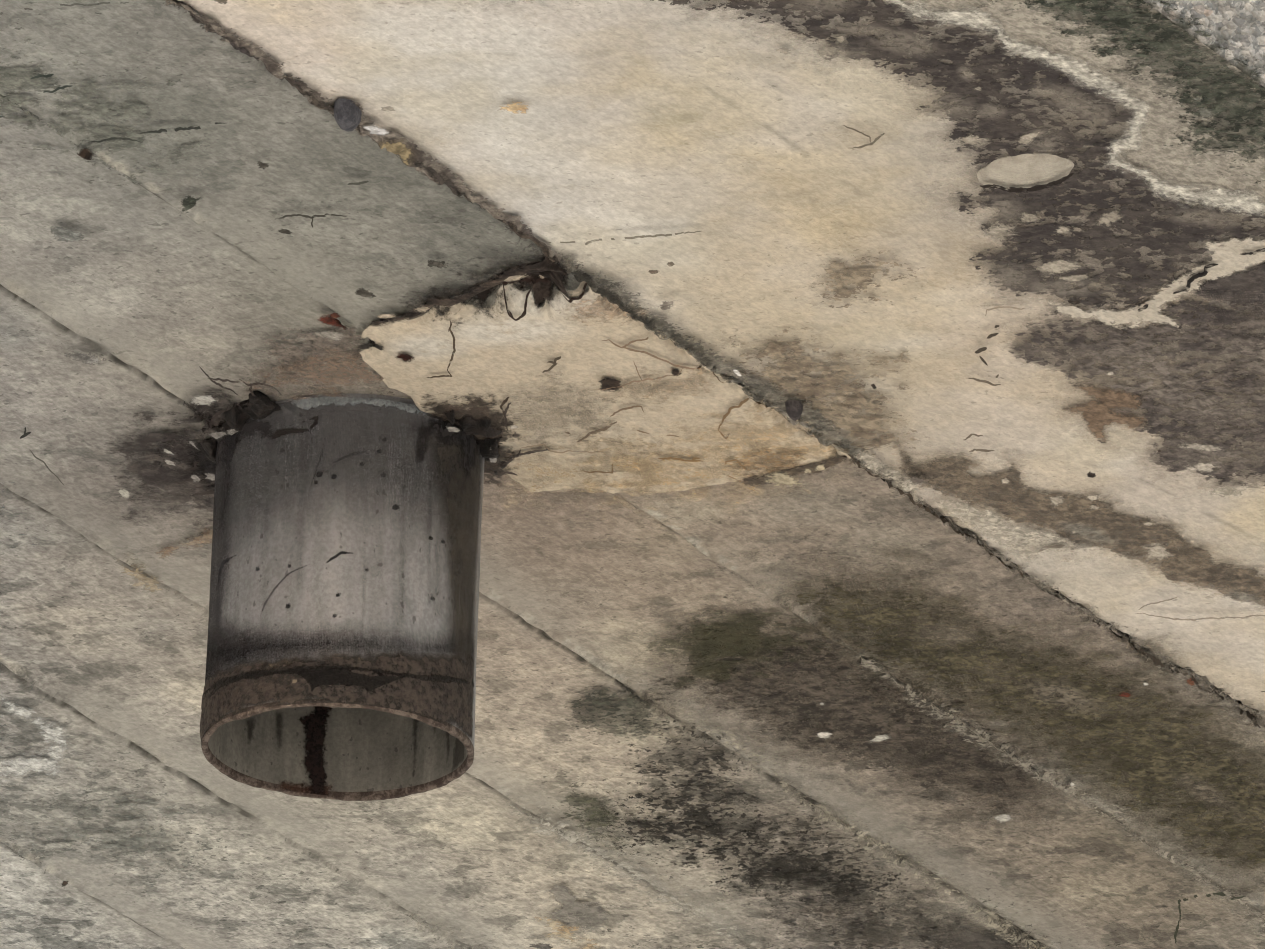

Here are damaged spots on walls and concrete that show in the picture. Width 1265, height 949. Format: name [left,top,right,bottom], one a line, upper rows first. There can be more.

spalling [163,0,334,116]
leakage [650,0,1265,487]
leakage [574,295,645,326]
leakage [215,420,273,519]
leakage [416,419,477,476]
spalling [352,101,1265,734]
leakage [729,327,1265,606]
corrosion [200,651,474,747]
corrosion [282,781,332,796]
leakage [507,597,1265,949]